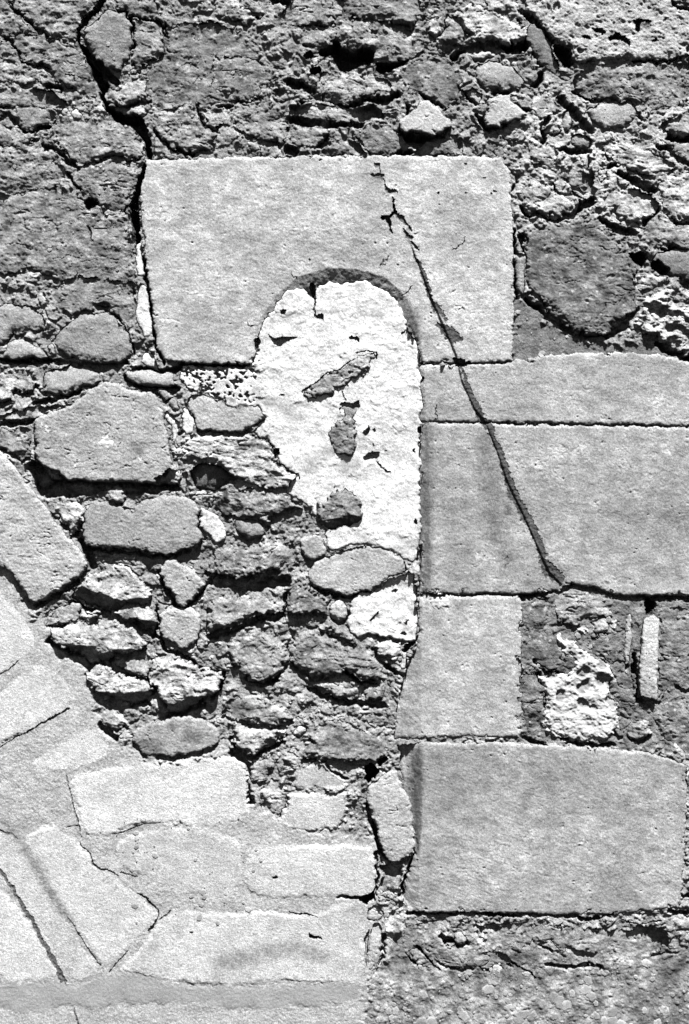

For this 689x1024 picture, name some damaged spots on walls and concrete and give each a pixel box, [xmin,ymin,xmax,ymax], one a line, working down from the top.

spalling [254,334,297,349]
crack [370,162,566,583]
spalling [362,425,387,461]
spalling [400,619,416,652]